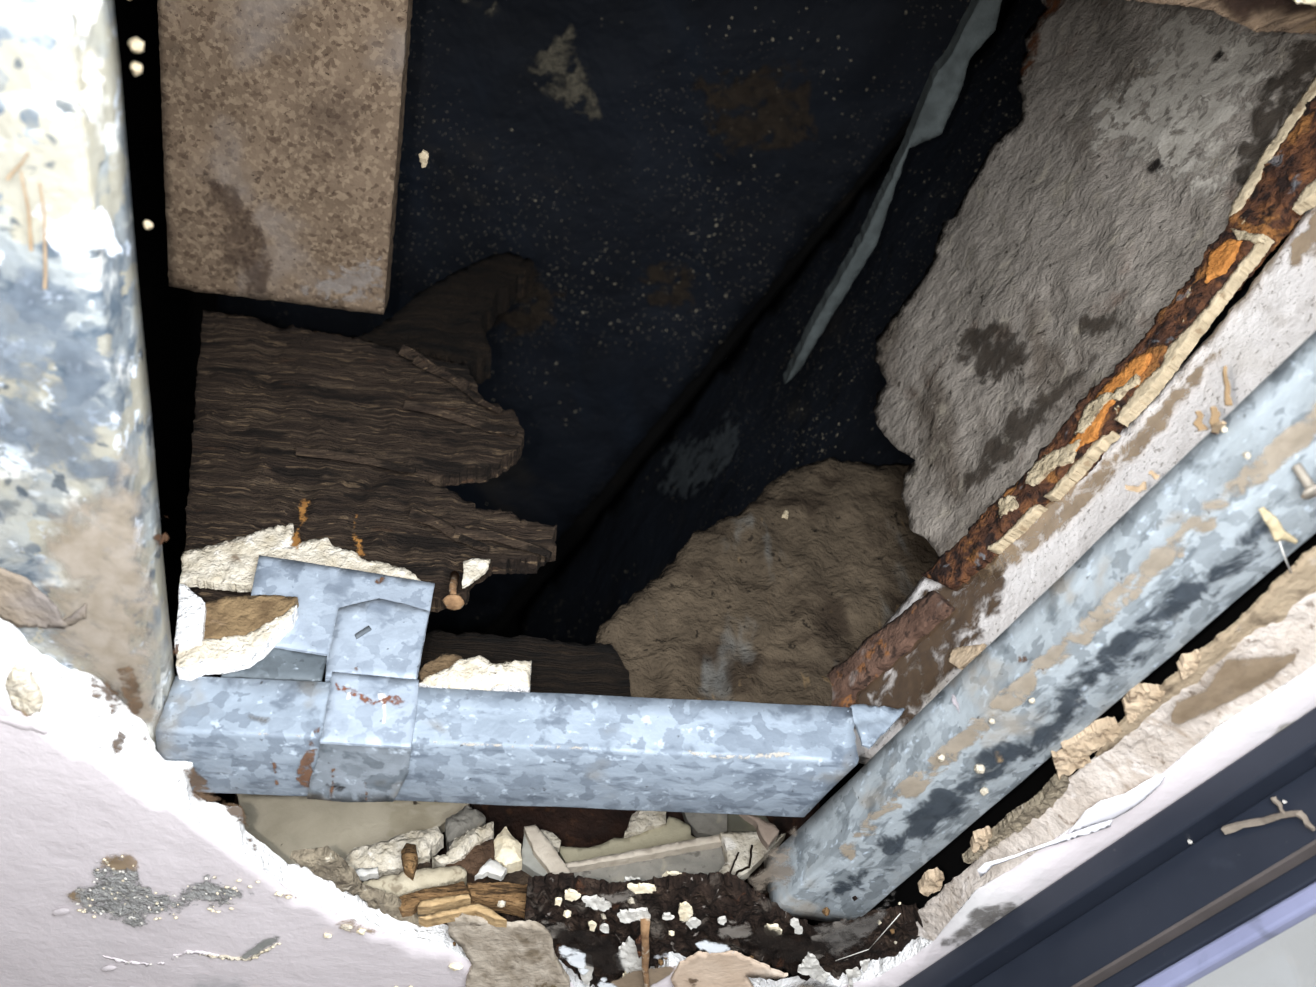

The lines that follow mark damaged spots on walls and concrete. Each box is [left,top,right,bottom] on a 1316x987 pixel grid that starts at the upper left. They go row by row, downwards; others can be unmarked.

leakage [956,322,1027,384]
leakage [1079,308,1122,336]
peeling [1025,374,1141,487]
peeling [462,558,490,588]
leakage [839,353,1316,871]
spalling [0,618,444,945]
spalling [916,592,1316,941]
peeling [555,888,581,906]
peeling [588,900,701,987]
peeling [767,918,803,934]
peeling [797,952,830,984]
leakage [826,872,868,895]